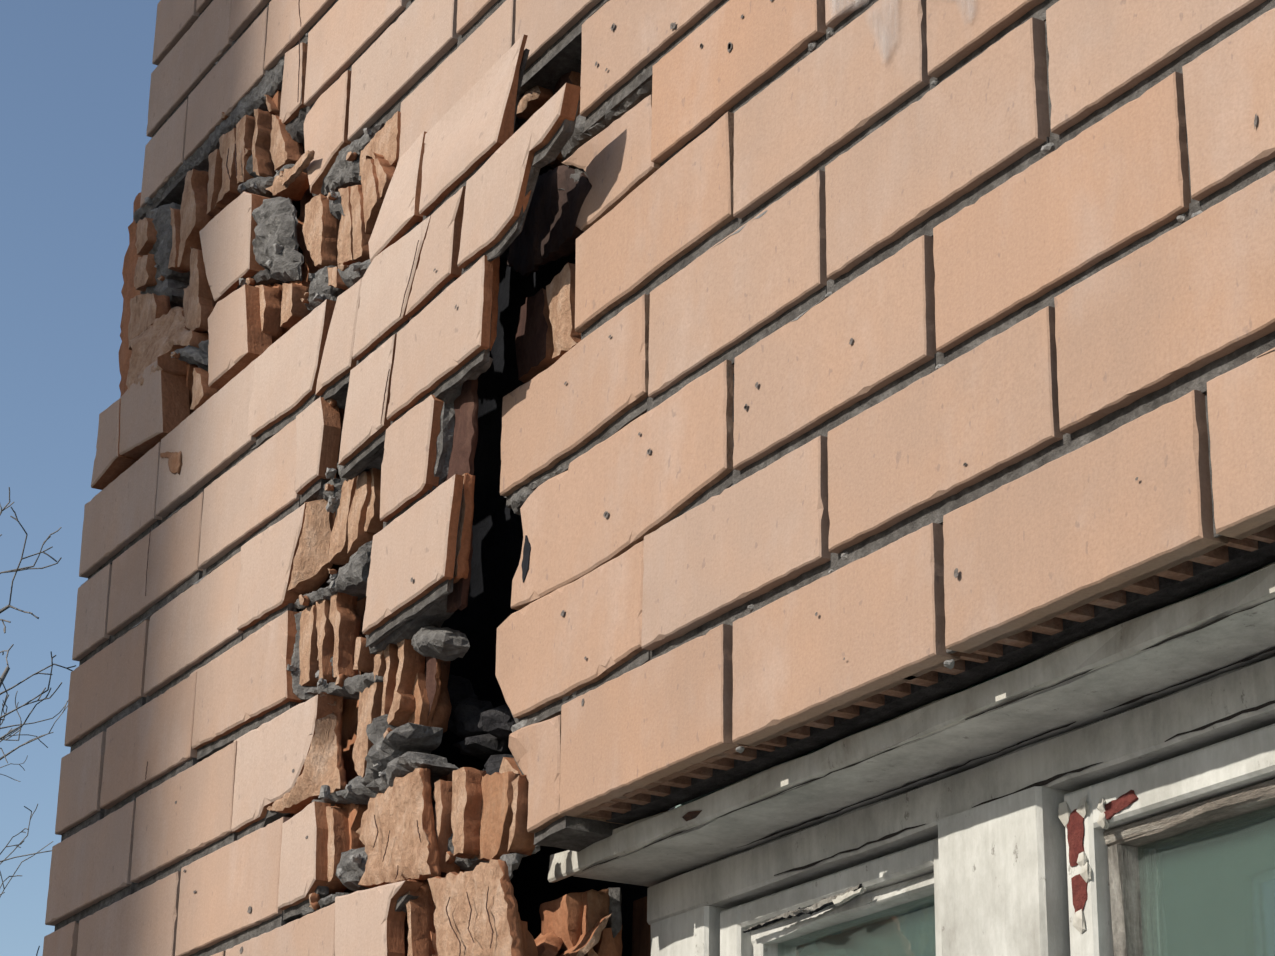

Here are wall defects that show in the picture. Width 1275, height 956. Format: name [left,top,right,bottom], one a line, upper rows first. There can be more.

spalling [91,42,401,490]
crack [292,200,305,267]
crack [431,58,925,956]
crack [1142,598,1275,651]
spalling [267,395,622,956]
crack [965,666,1105,720]
crack [1103,647,1275,712]
crack [1165,700,1275,742]
crack [737,722,1075,848]
crack [972,762,1102,808]